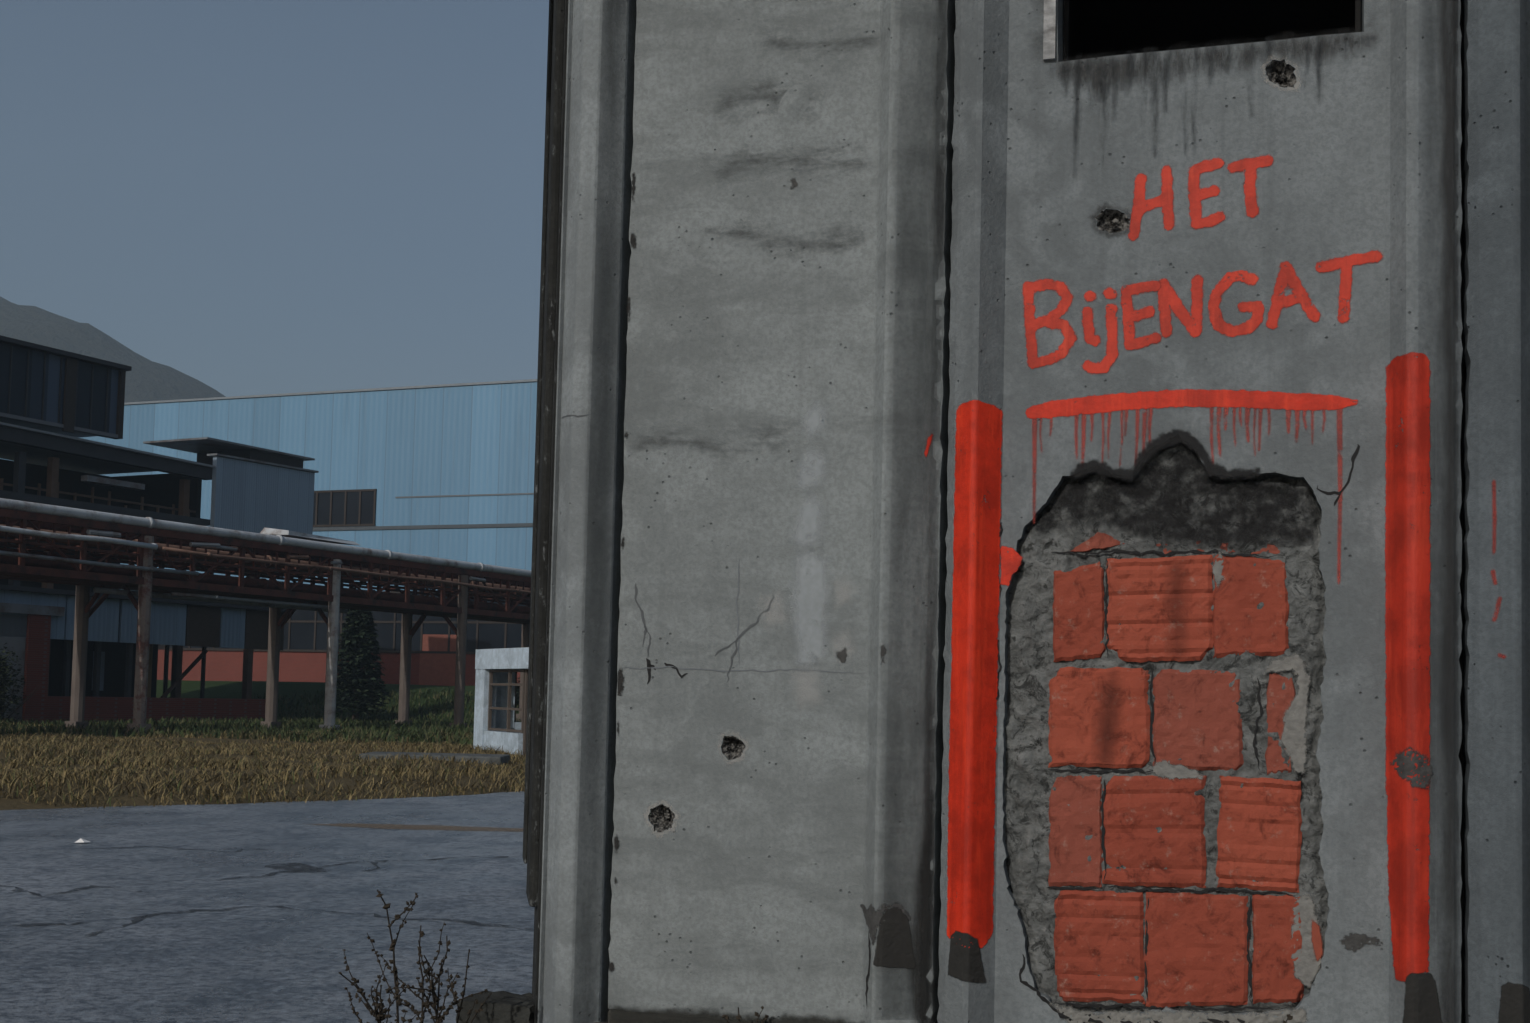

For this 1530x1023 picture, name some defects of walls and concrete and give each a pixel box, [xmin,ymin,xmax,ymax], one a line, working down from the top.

water stain [1060,37,1363,124]
spalling [1262,56,1300,90]
spalling [1092,206,1131,236]
crack [1317,444,1360,506]
crack [623,558,860,684]
spalling [720,734,747,762]
spalling [645,801,678,836]
spalling [1050,1003,1306,1023]